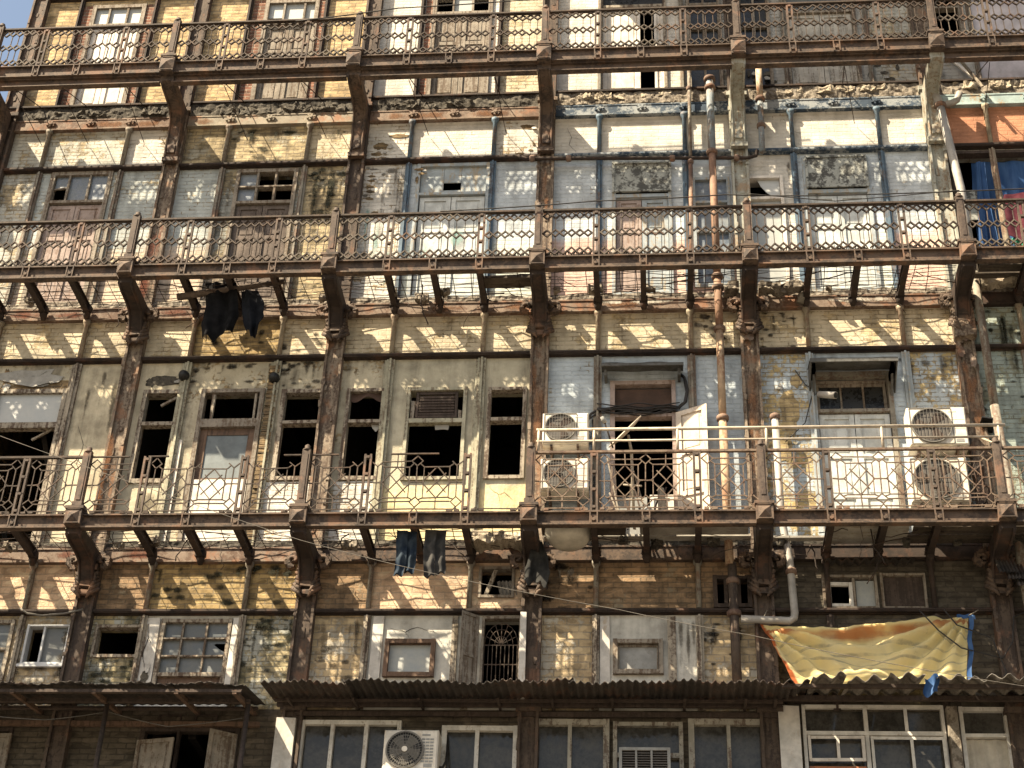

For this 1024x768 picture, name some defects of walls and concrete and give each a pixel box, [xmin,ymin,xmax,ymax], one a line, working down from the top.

spalling [953,80,1024,90]
spalling [31,109,121,120]
spalling [220,101,346,115]
corrosion [953,333,977,396]
peeling [0,368,69,392]
mould [240,618,292,672]